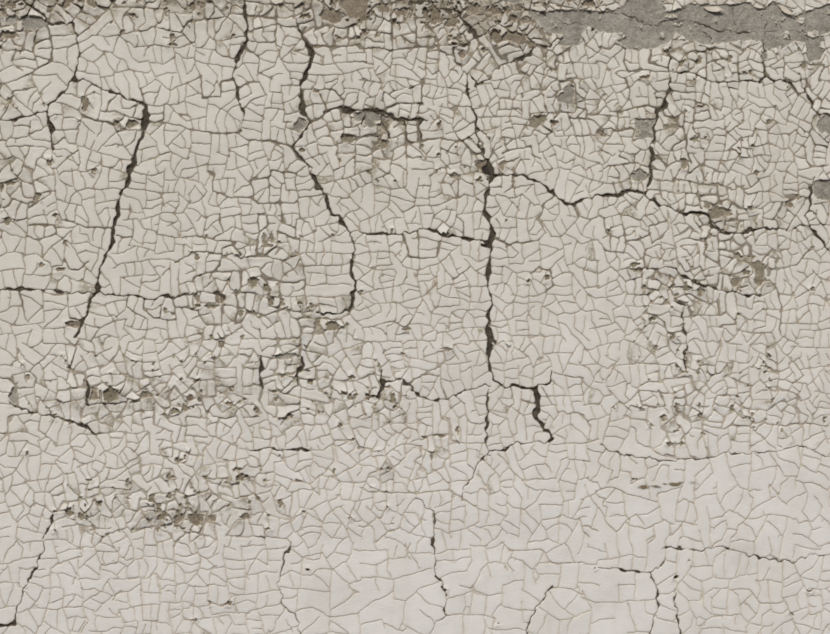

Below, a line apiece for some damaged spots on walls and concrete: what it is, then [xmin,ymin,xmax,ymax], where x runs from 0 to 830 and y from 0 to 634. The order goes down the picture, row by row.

peeling [0,0,126,55]
peeling [269,0,830,73]
peeling [450,158,506,183]
peeling [187,251,300,317]
peeling [272,301,349,385]
crack [697,436,714,479]
peeling [142,484,216,533]
crack [199,577,318,634]
crack [366,503,517,634]
crack [505,544,648,634]
crack [644,562,687,634]
crack [661,472,830,634]